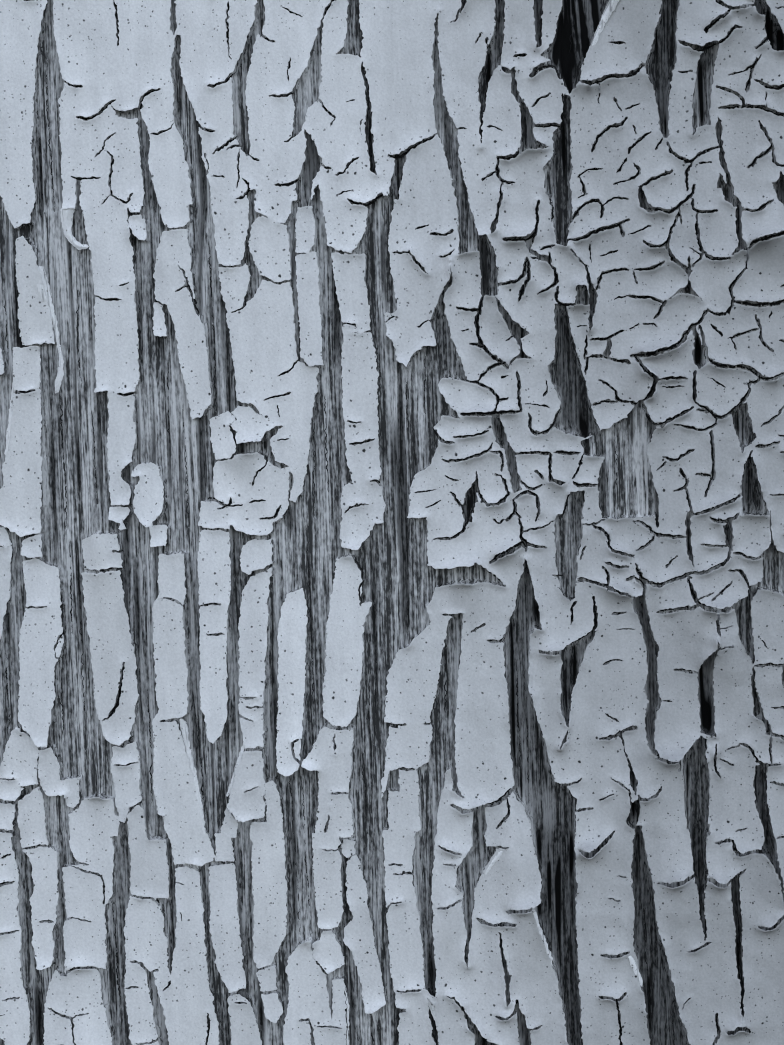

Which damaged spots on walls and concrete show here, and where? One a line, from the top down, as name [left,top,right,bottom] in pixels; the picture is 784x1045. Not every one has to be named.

peeling [0,0,47,228]
crack [389,137,434,158]
peeling [53,0,784,550]
crack [515,55,565,128]
crack [405,66,784,646]
peeling [0,236,288,1045]
peeling [276,556,386,1045]
crack [460,662,530,825]
peeling [381,242,784,1045]
crack [714,706,784,783]